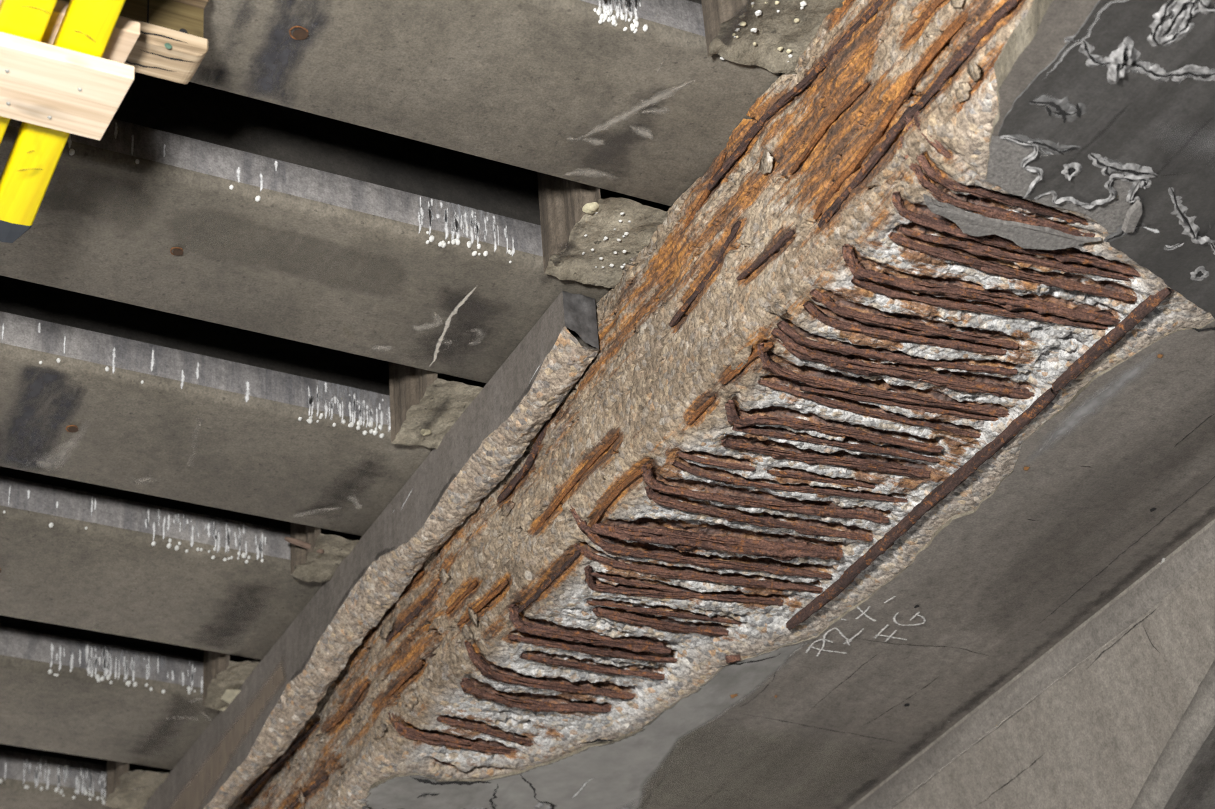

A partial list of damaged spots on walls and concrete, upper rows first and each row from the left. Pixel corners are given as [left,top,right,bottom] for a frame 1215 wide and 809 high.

crack [1064,0,1215,82]
spalling [955,82,972,102]
spalling [759,149,773,175]
peeling [986,135,1044,201]
peeling [1033,174,1142,235]
crack [1001,95,1215,255]
rust [902,207,1114,293]
spalling [867,280,1006,309]
rust [772,334,1003,423]
rust [651,415,940,536]
rust [582,531,798,633]
crack [412,773,557,809]